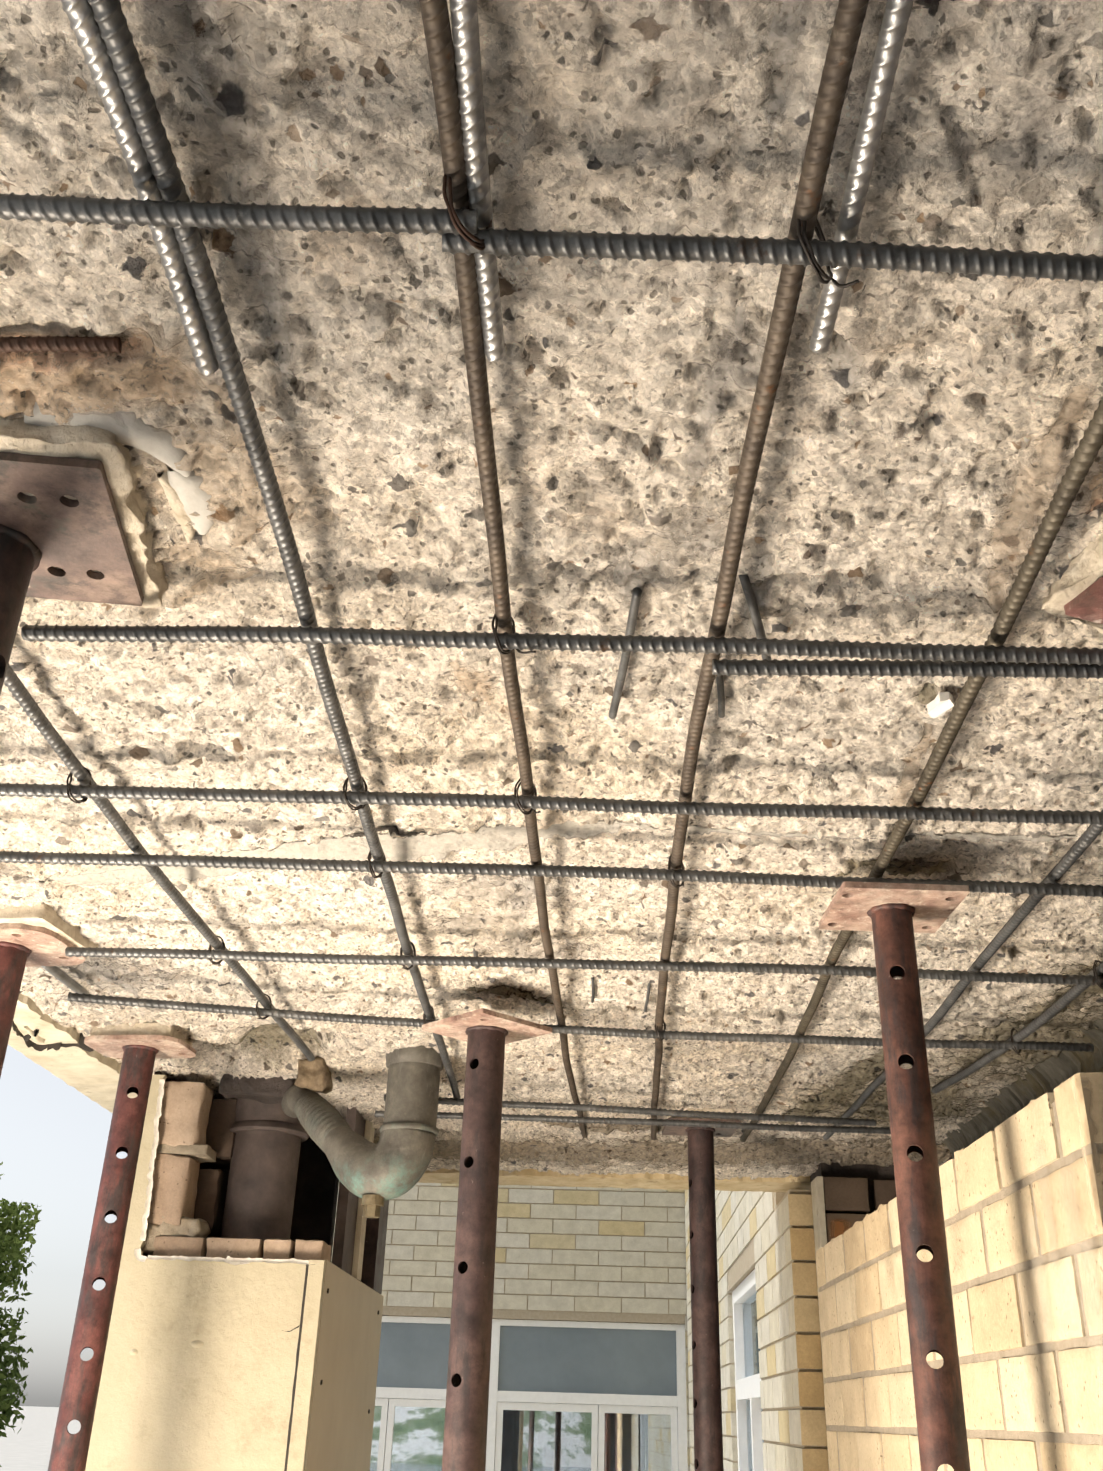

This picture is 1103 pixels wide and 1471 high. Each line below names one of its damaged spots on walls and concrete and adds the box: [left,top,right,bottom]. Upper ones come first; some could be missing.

corrosion [0,336,168,416]
spalling [917,682,954,719]
spalling [26,819,882,886]
spalling [904,830,1078,843]
spalling [1081,1080,1102,1174]